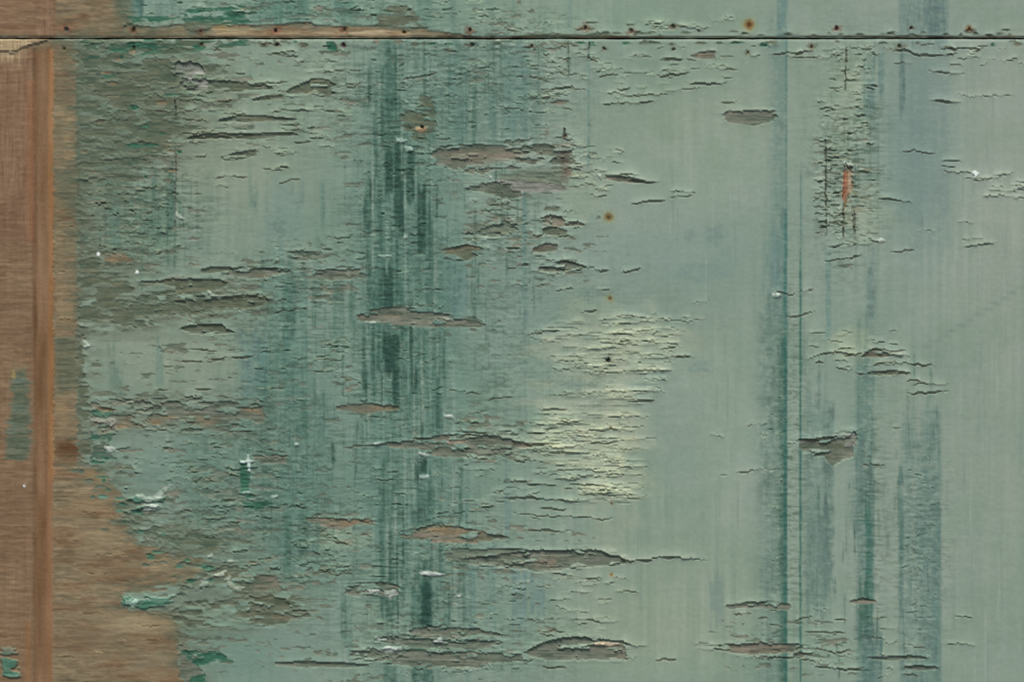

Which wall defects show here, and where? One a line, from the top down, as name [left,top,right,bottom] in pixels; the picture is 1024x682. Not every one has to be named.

rust [739,15,760,35]
peeling [722,108,779,126]
peeling [398,96,579,200]
peeling [0,0,487,682]
peeling [800,428,858,468]
peeling [400,526,626,573]
peeling [274,623,629,669]